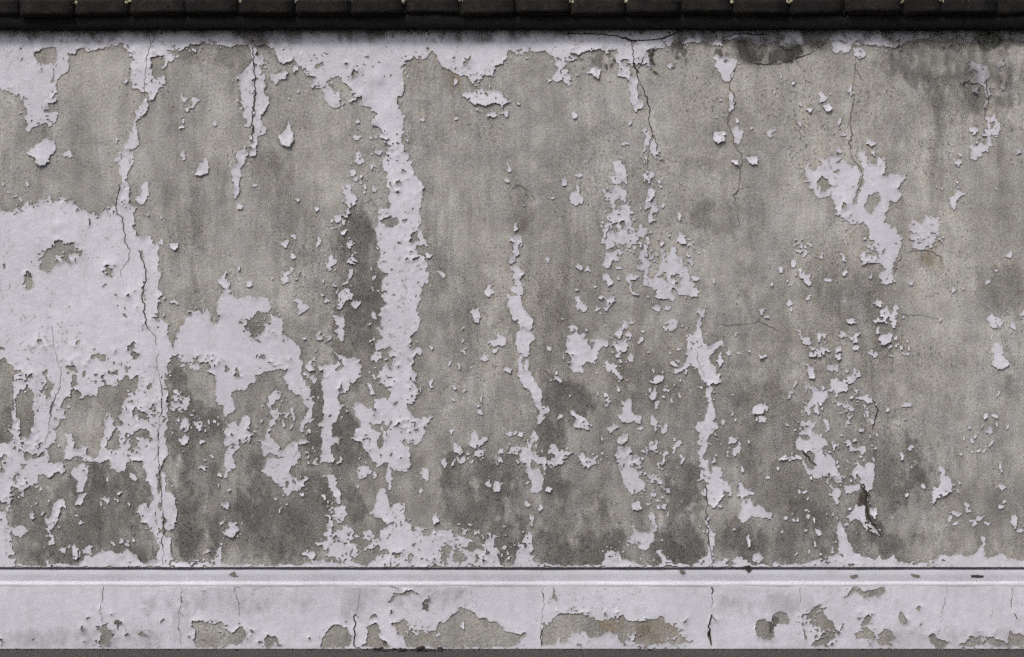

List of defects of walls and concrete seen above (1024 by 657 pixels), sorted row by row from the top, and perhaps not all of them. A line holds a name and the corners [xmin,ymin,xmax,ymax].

crack [564,30,683,192]
peeling [573,128,703,314]
water stain [719,39,802,64]
crack [720,33,831,229]
peeling [787,91,965,285]
crack [115,185,165,563]
peeling [563,319,644,433]
peeling [777,329,879,505]
peeling [320,588,491,649]
peeling [542,588,694,649]
crack [703,485,714,645]
crack [863,486,882,536]